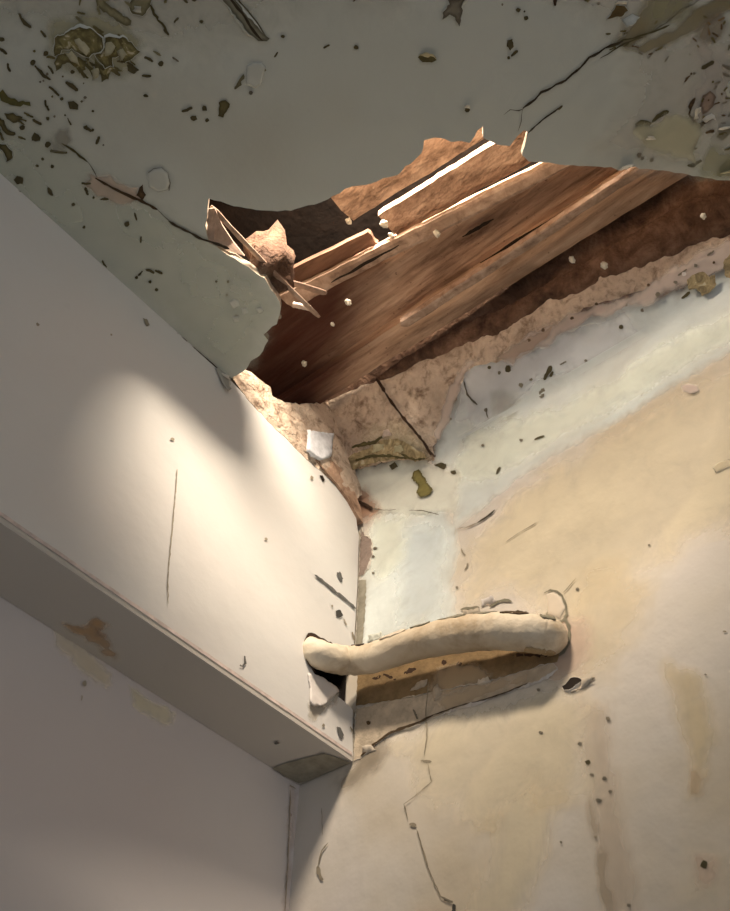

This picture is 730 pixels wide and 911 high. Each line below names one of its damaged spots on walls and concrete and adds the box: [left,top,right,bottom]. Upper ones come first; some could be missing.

flaking render [216,194,730,499]